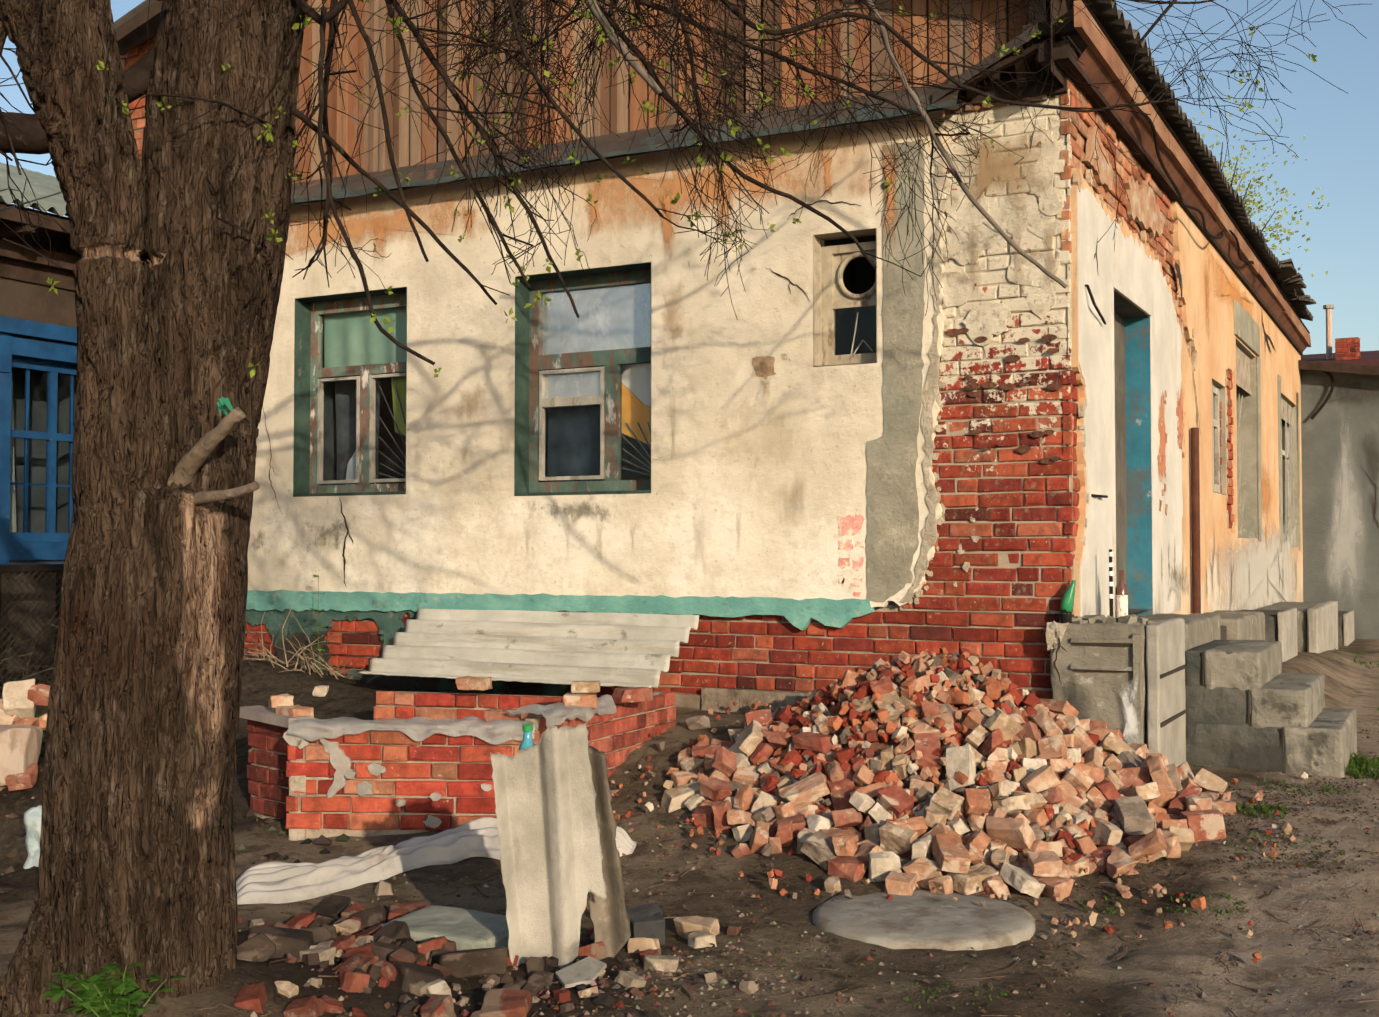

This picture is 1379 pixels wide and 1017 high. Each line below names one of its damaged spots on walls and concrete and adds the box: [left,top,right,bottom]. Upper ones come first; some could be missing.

corrosion [292,199,474,250]
corrosion [589,154,831,245]
corrosion [885,163,895,220]
spalling [752,353,788,379]
spalling [900,77,1198,651]
crack [339,497,353,586]
spalling [325,614,384,675]
spalling [399,611,417,632]